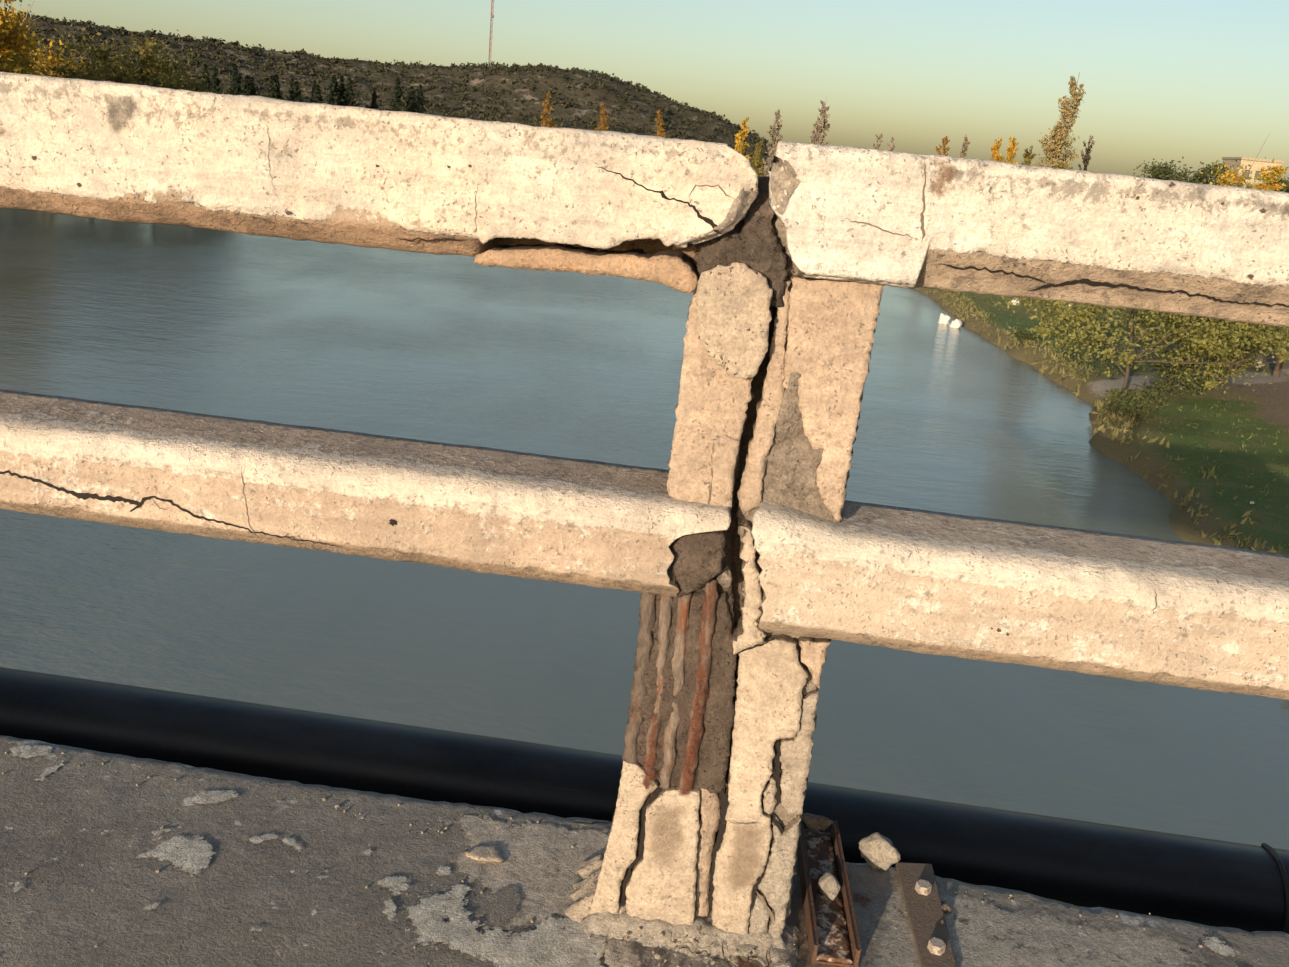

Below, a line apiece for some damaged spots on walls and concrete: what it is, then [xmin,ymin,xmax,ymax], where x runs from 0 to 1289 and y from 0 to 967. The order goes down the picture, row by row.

spalling [474,159,801,380]
crack [597,167,735,235]
crack [943,264,1289,307]
crack [0,459,340,547]
spalling [757,373,841,523]
rust [643,714,658,789]
spalling [621,530,737,793]
rust [679,663,707,795]
peeling [138,826,217,876]
peeling [378,814,608,967]
crack [708,740,784,911]
rust [804,829,871,966]